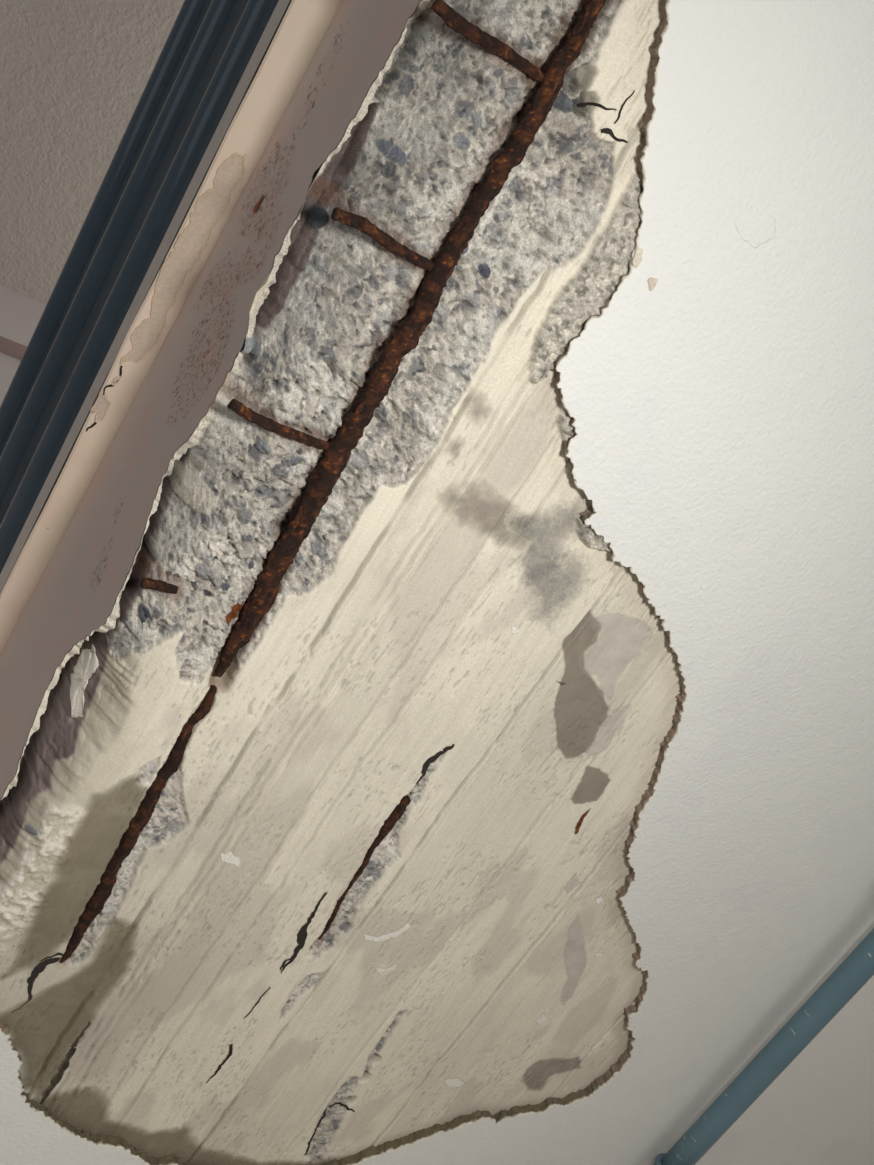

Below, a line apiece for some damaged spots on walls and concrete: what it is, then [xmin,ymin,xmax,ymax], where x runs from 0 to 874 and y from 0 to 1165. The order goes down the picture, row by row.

crack [577,90,635,143]
corrosion [169,142,295,422]
spalling [0,0,687,1165]
corrosion [226,601,243,626]
water stain [554,611,652,803]
crack [416,744,455,784]
crack [305,1102,355,1155]